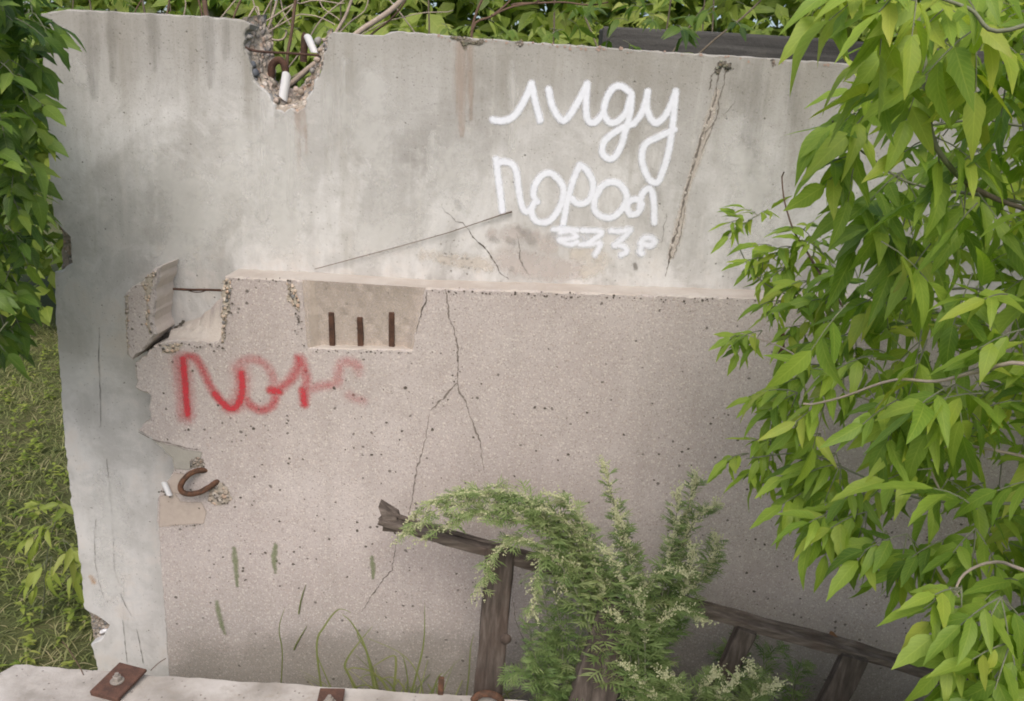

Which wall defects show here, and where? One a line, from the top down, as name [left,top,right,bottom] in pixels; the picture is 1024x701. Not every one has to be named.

spalling [242,14,333,112]
crack [661,67,735,277]
crack [444,210,527,278]
spalling [141,270,243,354]
peeling [139,432,256,538]
crack [362,289,484,611]